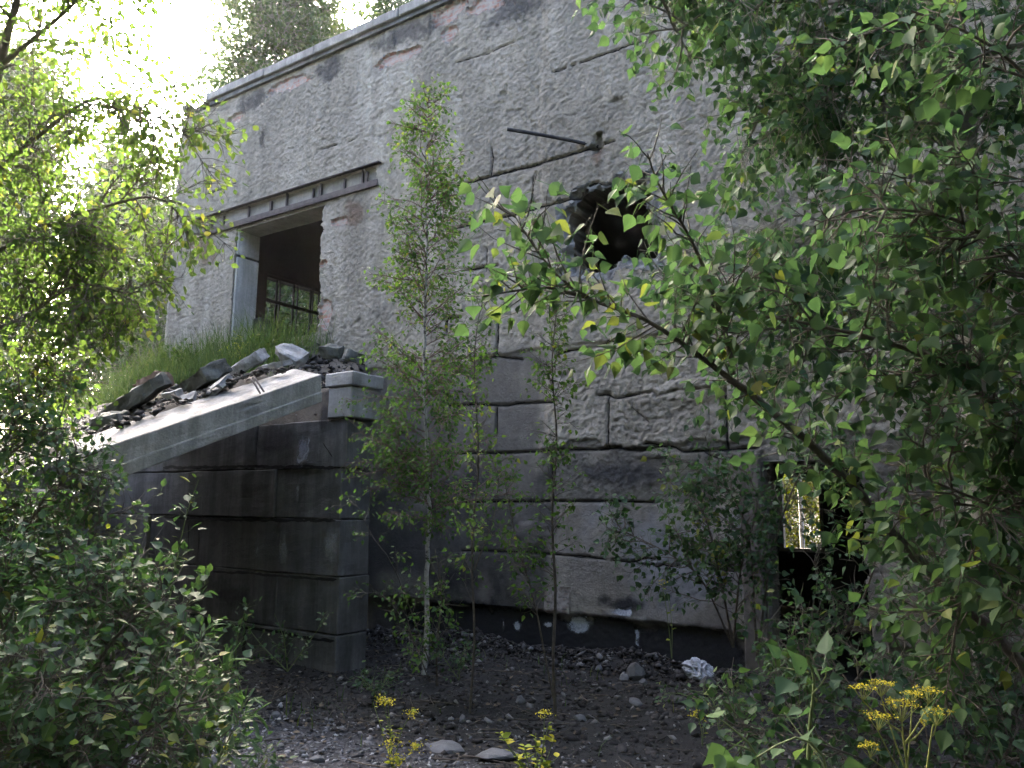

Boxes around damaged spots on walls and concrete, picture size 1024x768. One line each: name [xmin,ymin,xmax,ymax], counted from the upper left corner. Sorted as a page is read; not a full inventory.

flaking render [372,44,422,71]
flaking render [266,72,313,98]
spalling [555,162,667,284]
flaking render [317,298,333,331]